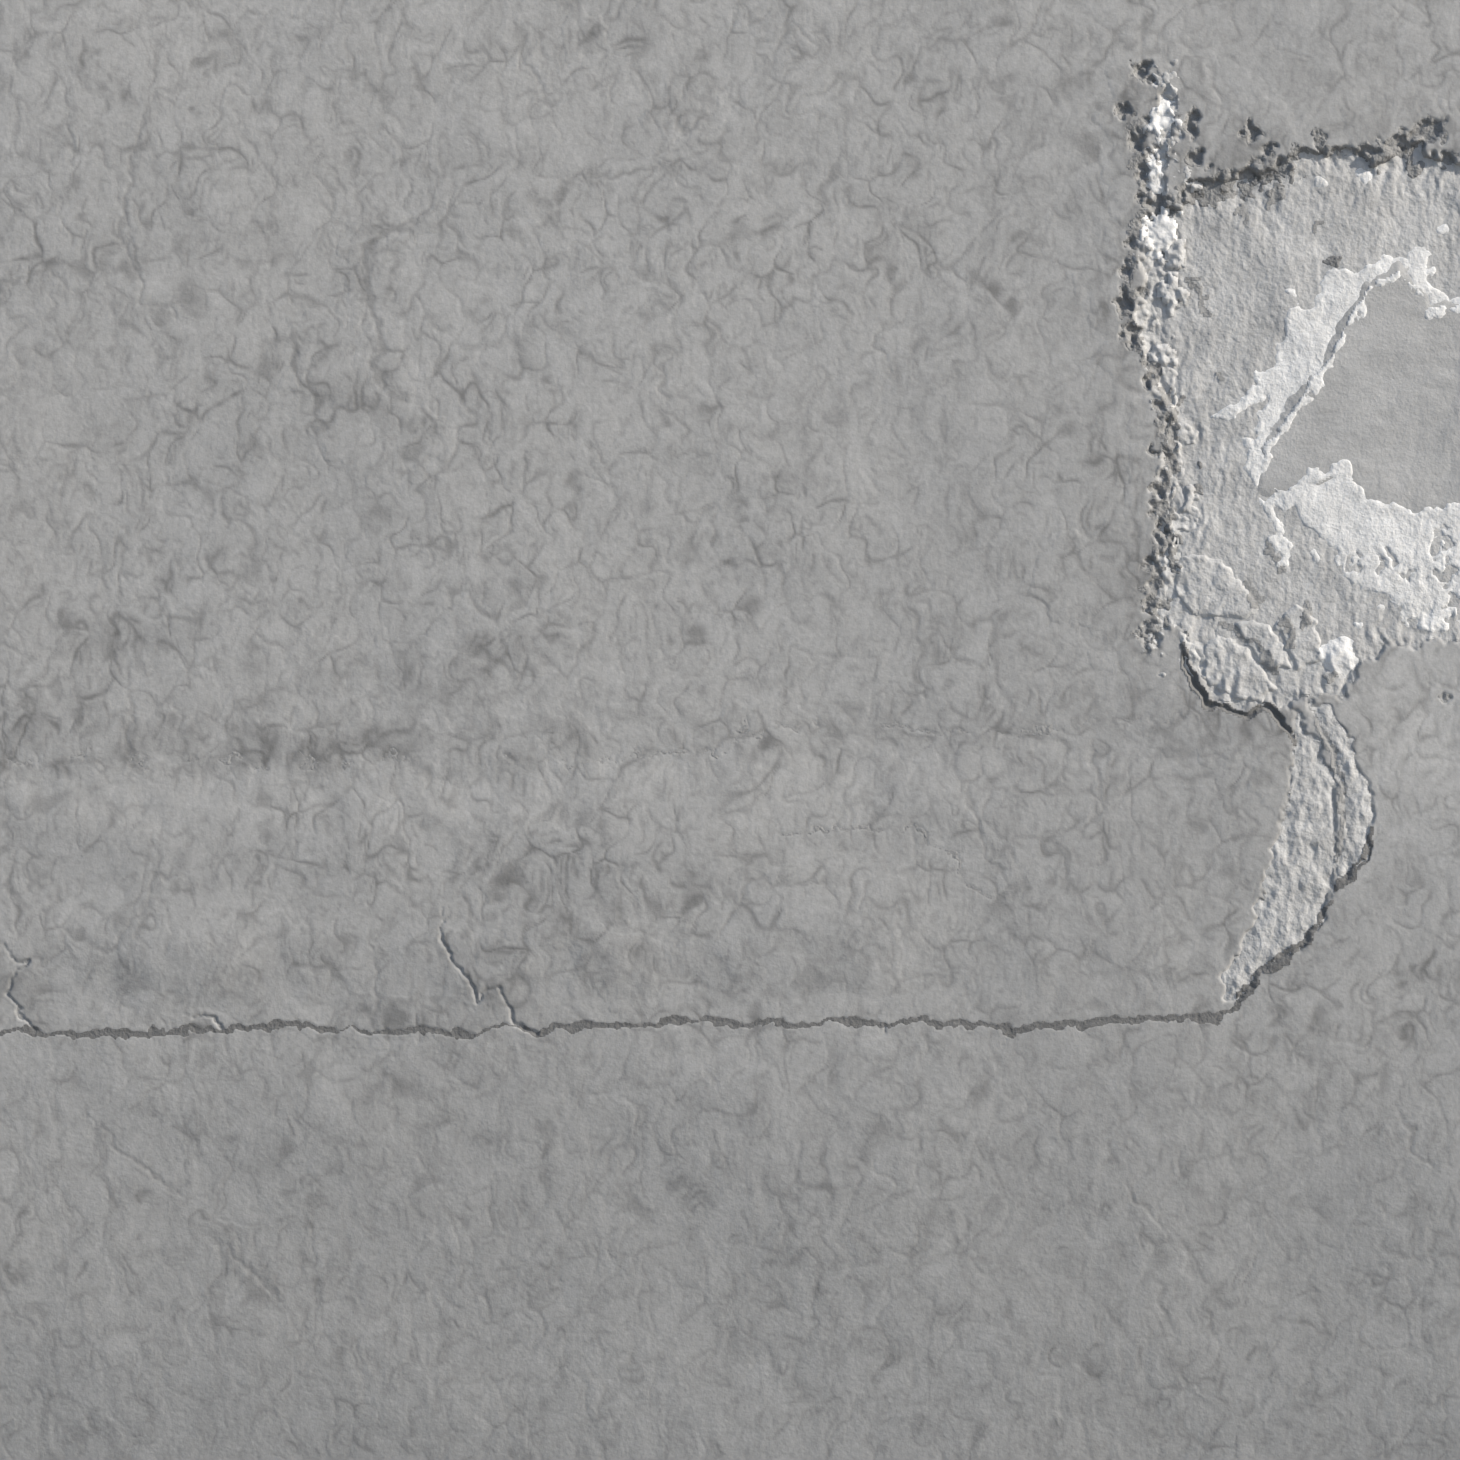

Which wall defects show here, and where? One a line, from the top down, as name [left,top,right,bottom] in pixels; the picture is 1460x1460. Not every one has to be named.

crack [0,936,1256,1040]
flaking render [1140,113,1460,1005]